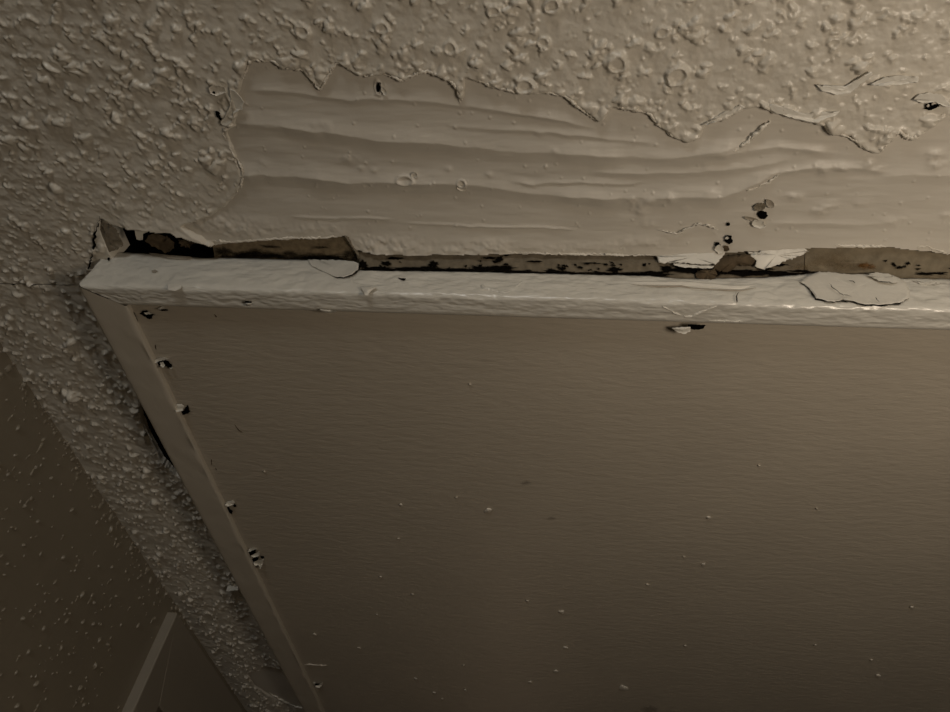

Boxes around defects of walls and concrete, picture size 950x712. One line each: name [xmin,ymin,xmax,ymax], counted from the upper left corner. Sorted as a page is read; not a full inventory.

peeling [817,72,950,107]
peeling [769,104,840,123]
flaking render [744,199,774,229]
peeling [308,259,359,277]
damp [216,246,816,277]
crack [86,217,950,323]
peeling [657,222,733,269]
peeling [748,248,809,270]
peeling [800,271,941,305]
crack [139,401,176,475]